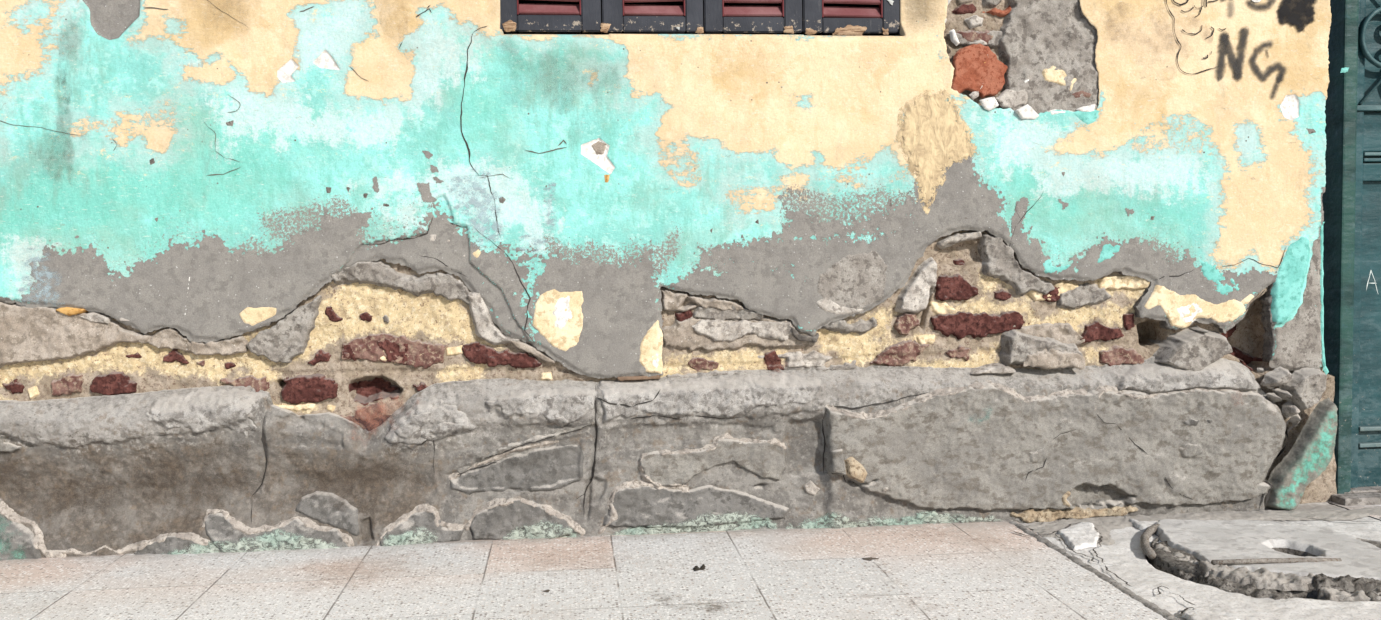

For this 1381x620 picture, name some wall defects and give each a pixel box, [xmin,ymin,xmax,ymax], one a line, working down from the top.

spalling [83,0,140,40]
spalling [945,0,1099,124]
crack [362,26,566,340]
spalling [0,151,1326,444]
spalling [0,435,22,452]
crack [251,416,267,524]
crack [421,385,741,508]
crack [822,392,929,482]